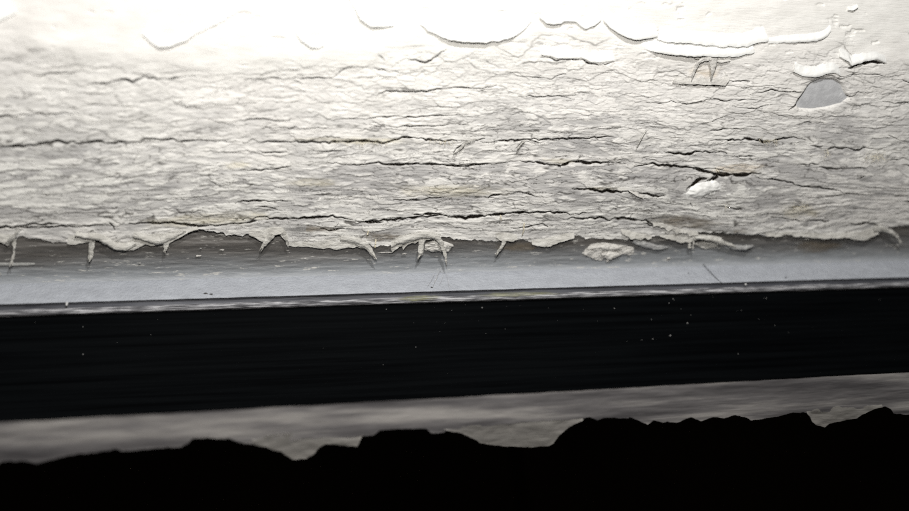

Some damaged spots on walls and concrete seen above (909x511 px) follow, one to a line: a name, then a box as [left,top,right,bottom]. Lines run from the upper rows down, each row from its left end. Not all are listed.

peeling [642,25,831,81]
crack [28,72,195,85]
crack [246,49,611,98]
spalling [794,48,887,108]
crack [833,60,909,104]
crack [0,80,865,222]
crack [0,191,665,231]
peeling [67,226,199,262]
peeling [249,227,377,260]
peeling [390,231,454,267]
peeling [582,222,736,262]
peeling [766,225,902,244]